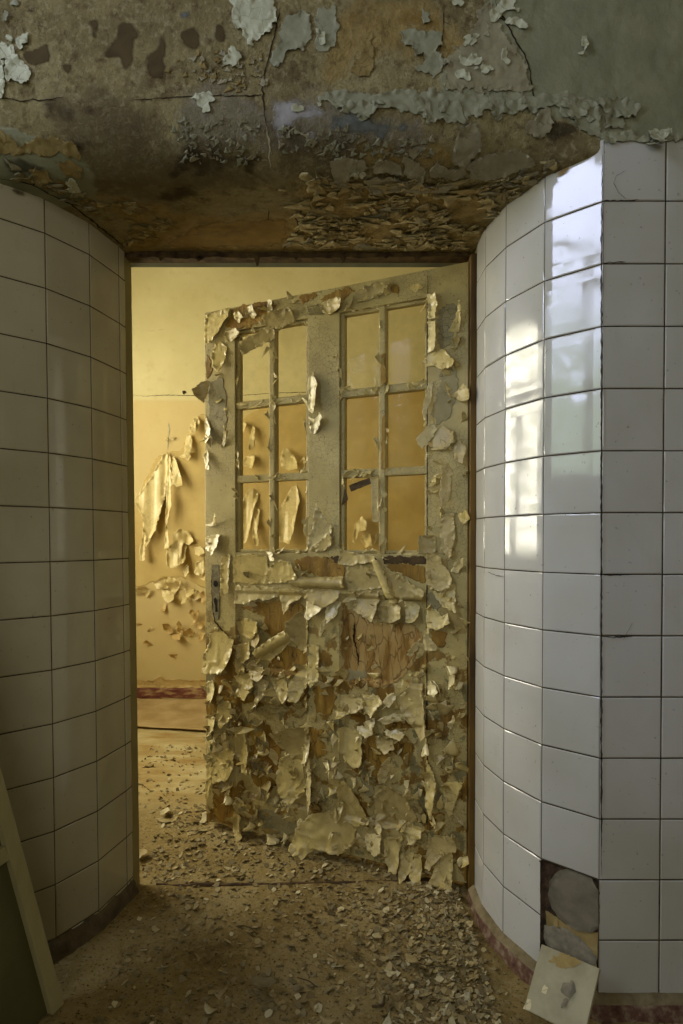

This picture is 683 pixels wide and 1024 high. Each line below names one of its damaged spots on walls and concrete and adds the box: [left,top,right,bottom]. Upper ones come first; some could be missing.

peeling [0,32,31,98]
damp [105,22,138,68]
damp [147,36,165,79]
damp [180,12,199,49]
crack [135,8,280,169]
damp [215,25,225,42]
crack [495,1,534,96]
peeling [0,129,83,193]
peeling [130,0,641,266]
peeling [299,281,423,315]
flaking render [134,299,470,890]
peeling [540,860,600,968]